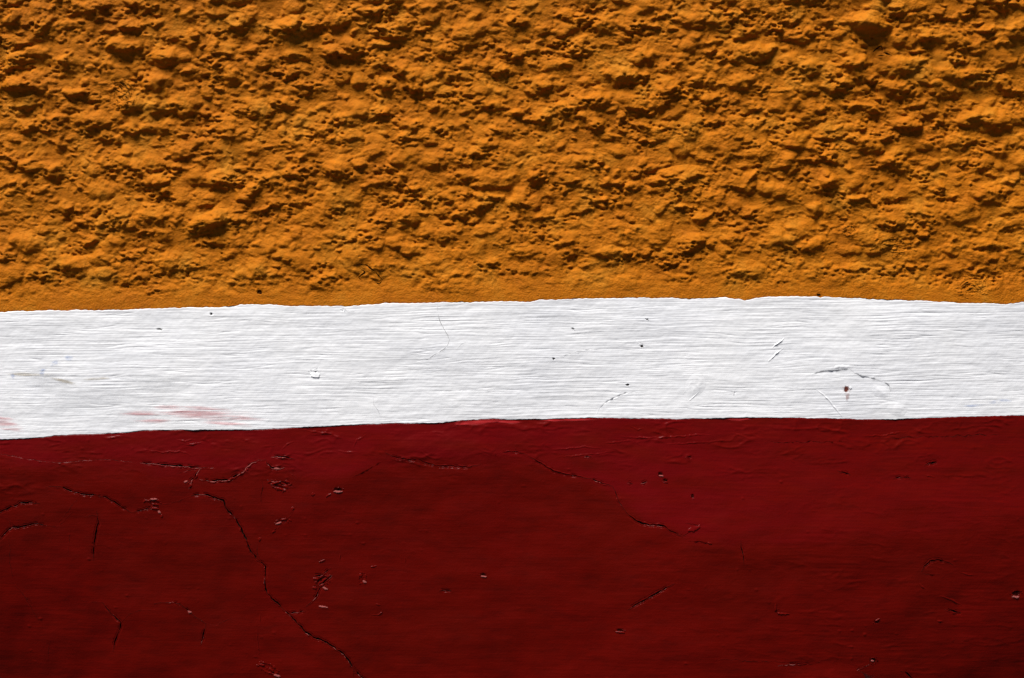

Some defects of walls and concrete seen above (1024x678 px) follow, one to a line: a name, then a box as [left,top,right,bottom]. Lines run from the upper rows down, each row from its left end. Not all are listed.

crack [0,439,365,678]